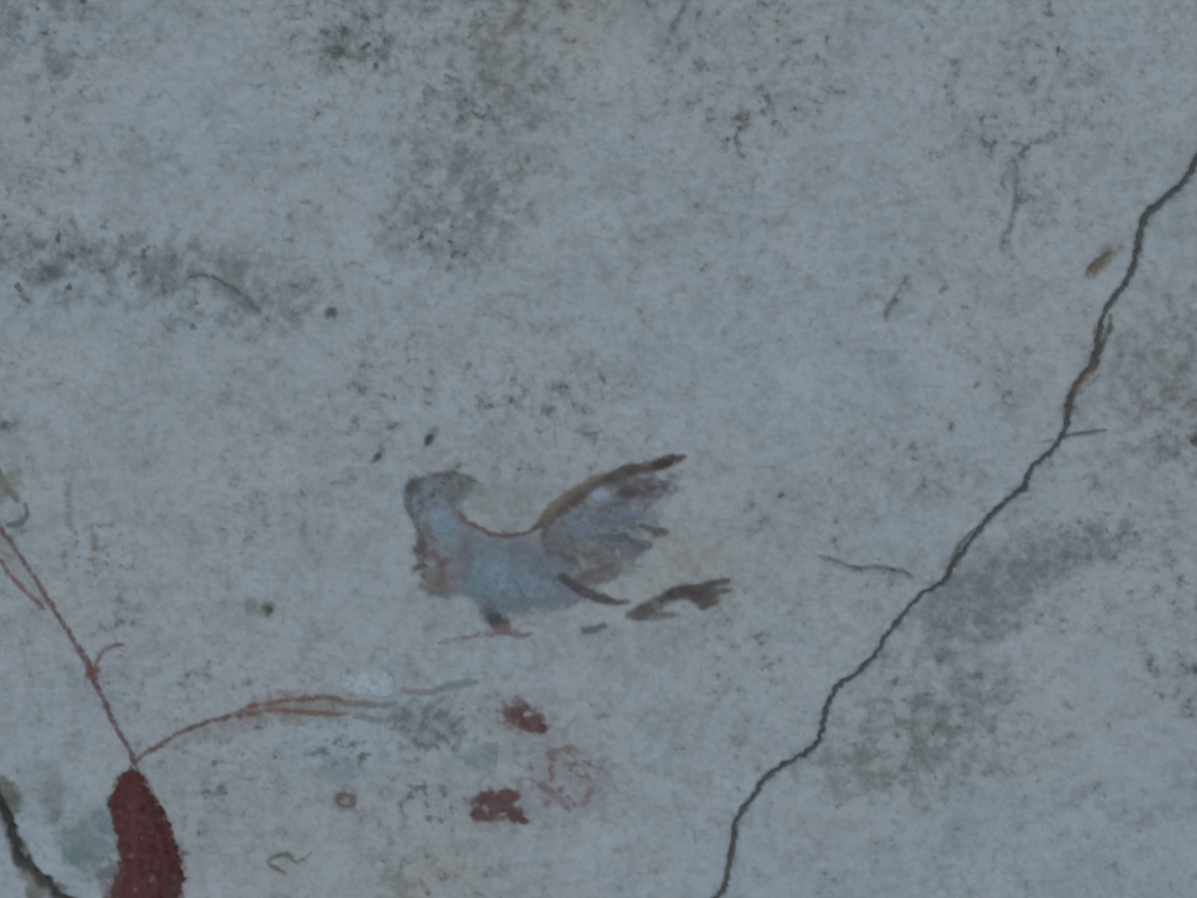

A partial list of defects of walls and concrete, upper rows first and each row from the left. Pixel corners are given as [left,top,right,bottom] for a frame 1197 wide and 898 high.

crack [0,777,70,898]
crack [714,154,1197,898]